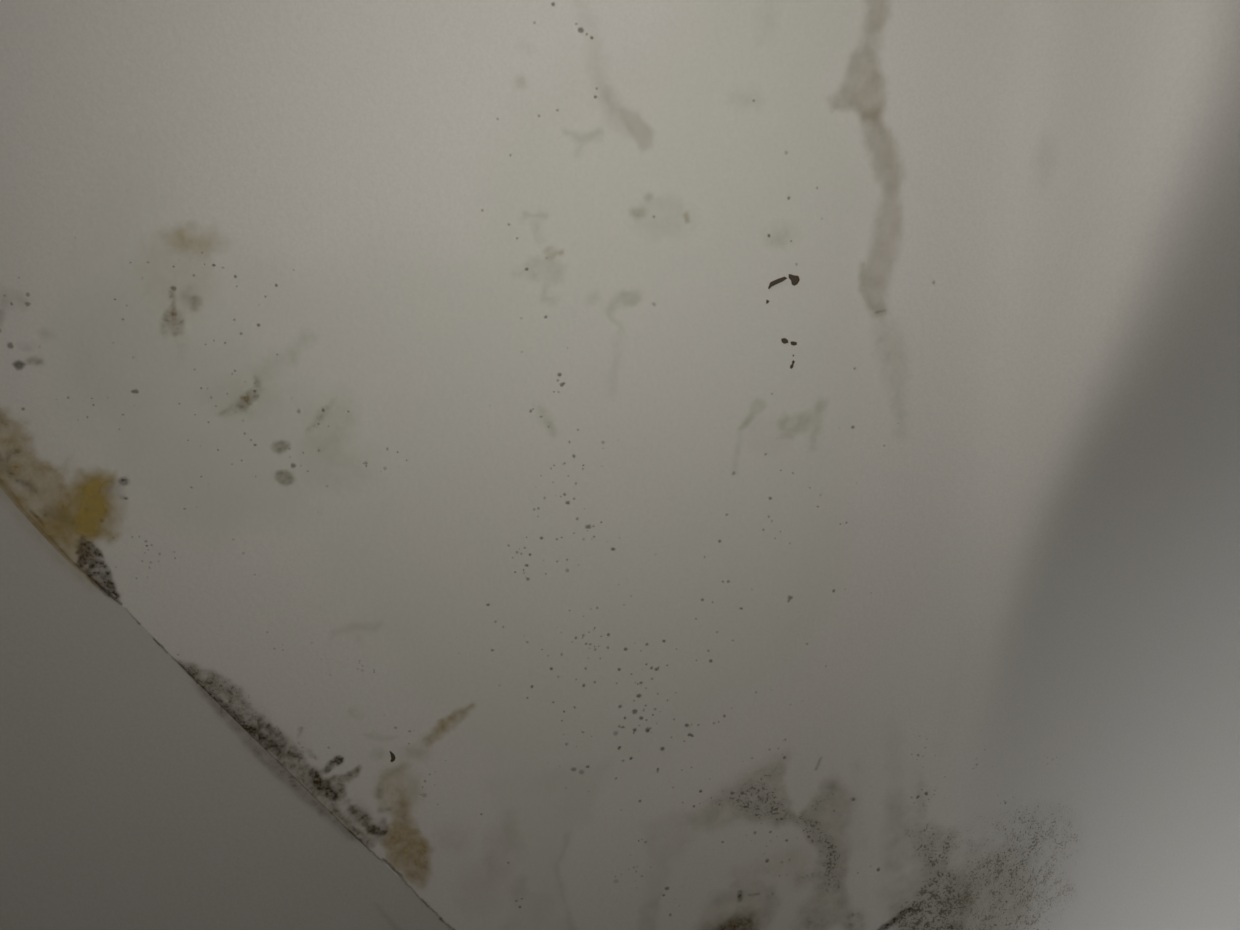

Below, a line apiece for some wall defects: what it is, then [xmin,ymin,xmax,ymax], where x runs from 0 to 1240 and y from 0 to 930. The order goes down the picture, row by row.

damp [76,540,120,599]
damp [189,667,387,841]
damp [885,875,960,930]